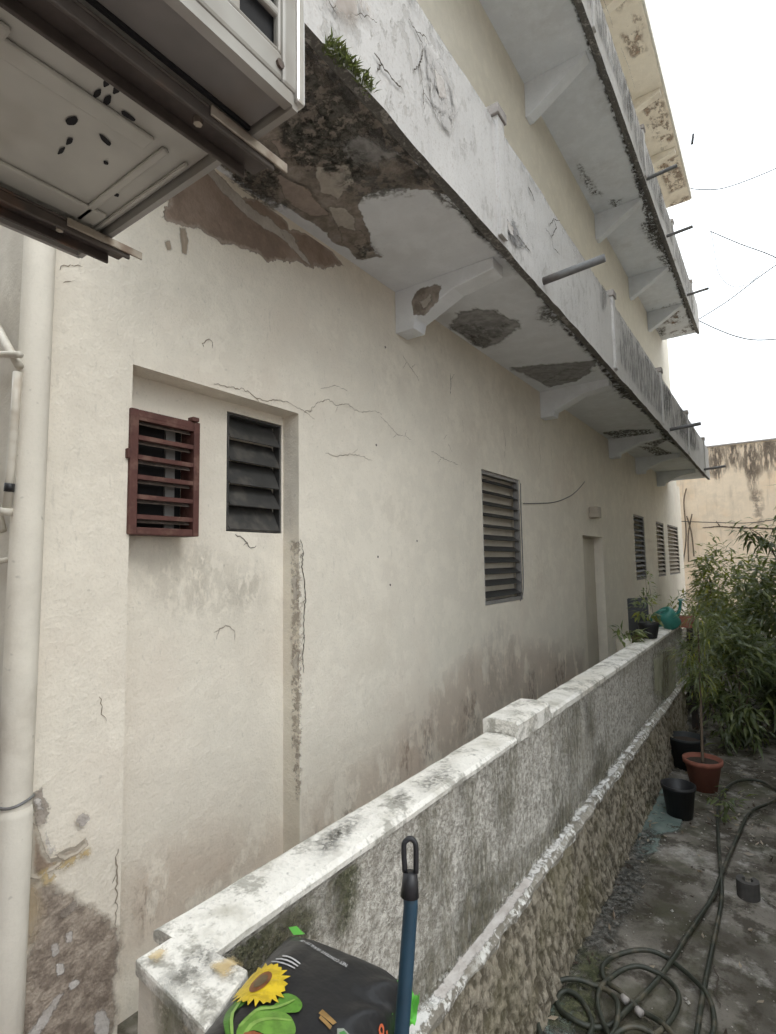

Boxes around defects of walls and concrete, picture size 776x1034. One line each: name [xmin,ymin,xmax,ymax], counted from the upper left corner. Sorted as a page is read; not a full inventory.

peeling [426,44,459,134]
peeling [163,43,444,270]
water stain [282,41,507,262]
water stain [227,167,288,208]
peeling [412,285,441,316]
crack [217,383,411,440]
water stain [692,442,776,476]
water stain [28,894,36,931]
flaking render [24,787,120,1034]
water stain [543,829,653,1034]
mould [173,950,237,981]